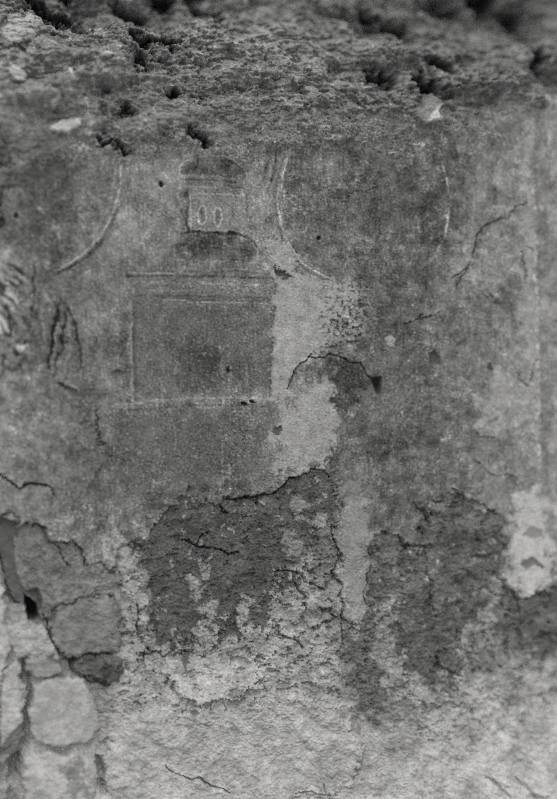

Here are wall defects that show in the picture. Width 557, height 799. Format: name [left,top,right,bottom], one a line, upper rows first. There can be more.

hole [23,0,88,35]
hole [106,0,229,74]
hole [409,0,557,78]
hole [359,54,466,99]
crack [286,352,373,390]
crack [0,472,56,497]
crack [219,467,333,515]
crack [1,509,88,568]
spalling [138,466,345,665]
crack [265,525,374,653]
spalling [359,492,508,707]
crack [42,613,114,688]